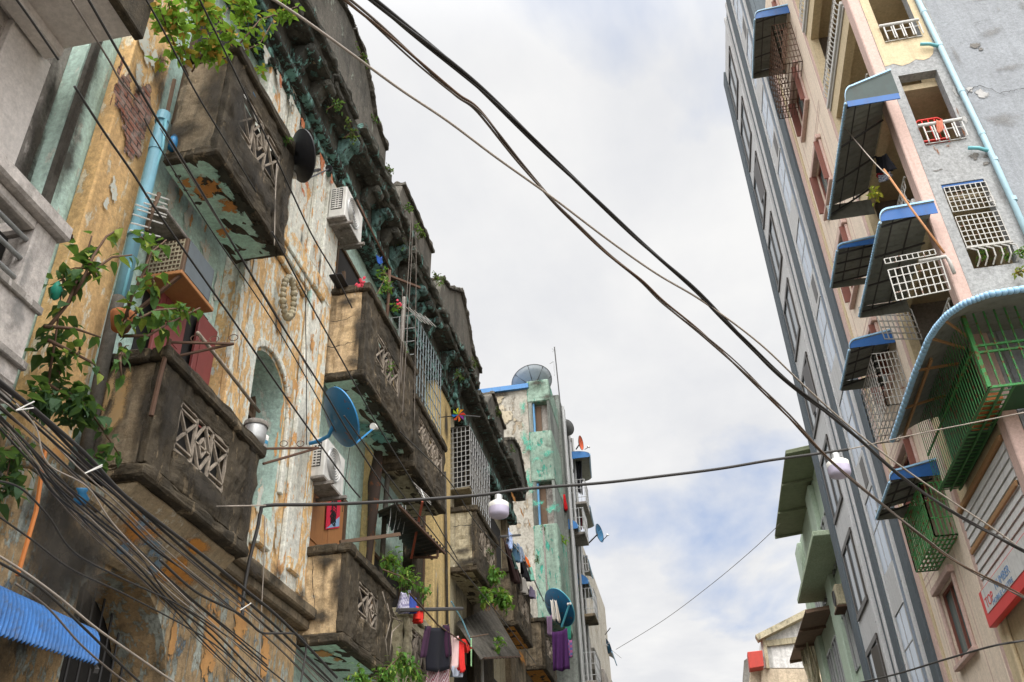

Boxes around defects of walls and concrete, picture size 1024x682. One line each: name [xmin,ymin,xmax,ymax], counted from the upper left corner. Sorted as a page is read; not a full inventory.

spalling [110,23,159,160]
peeling [166,174,238,230]
peeling [237,259,258,372]
peeling [276,287,300,341]
peeling [292,335,314,390]
flaking render [495,395,517,437]
peeling [255,482,264,521]
peeling [116,511,210,585]
peeling [167,618,177,660]
peeling [200,594,220,682]
peeling [233,585,248,655]
peeling [261,628,271,678]